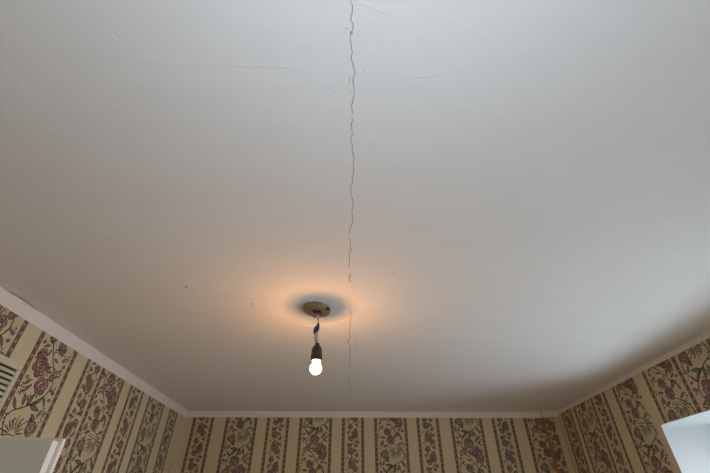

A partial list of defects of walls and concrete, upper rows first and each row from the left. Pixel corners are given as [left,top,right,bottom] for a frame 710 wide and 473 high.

crack [346,0,356,283]